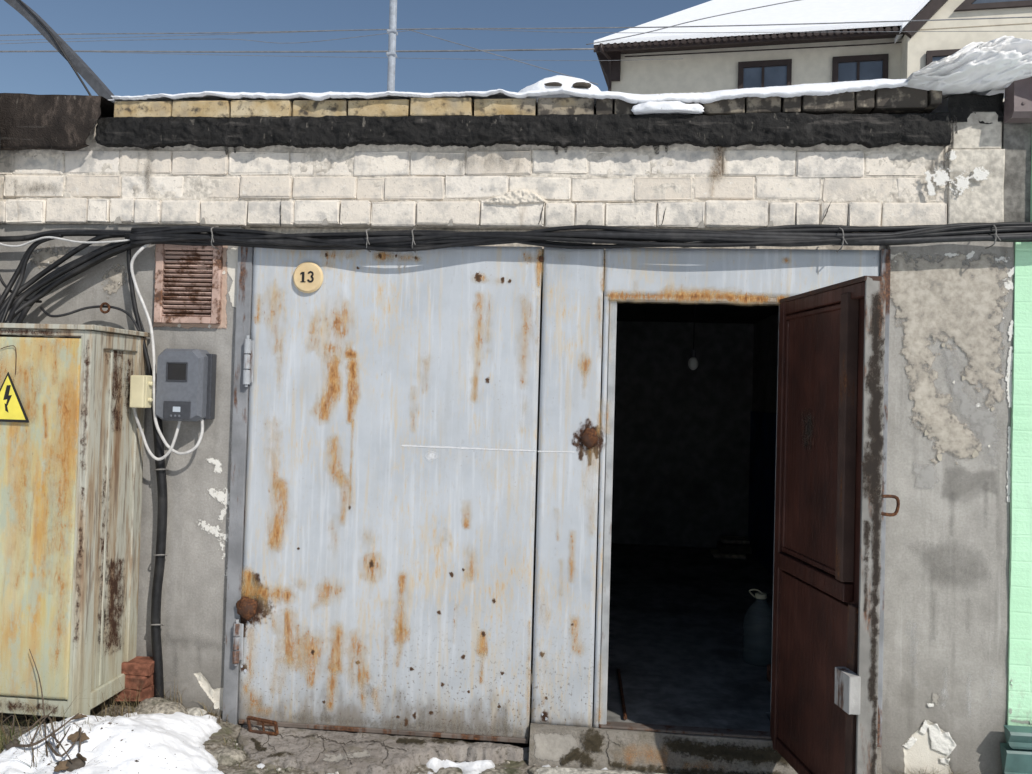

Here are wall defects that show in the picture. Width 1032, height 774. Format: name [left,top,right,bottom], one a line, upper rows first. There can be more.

peeling [924,150,991,196]
rust [602,279,786,304]
rust [309,305,359,437]
peeling [890,251,1015,465]
peeling [206,458,222,473]
rust [572,414,608,466]
peeling [197,487,230,576]
rust [268,472,287,547]
rust [861,292,885,774]
rust [240,566,377,709]
spalling [194,672,223,711]
spalling [902,720,956,774]